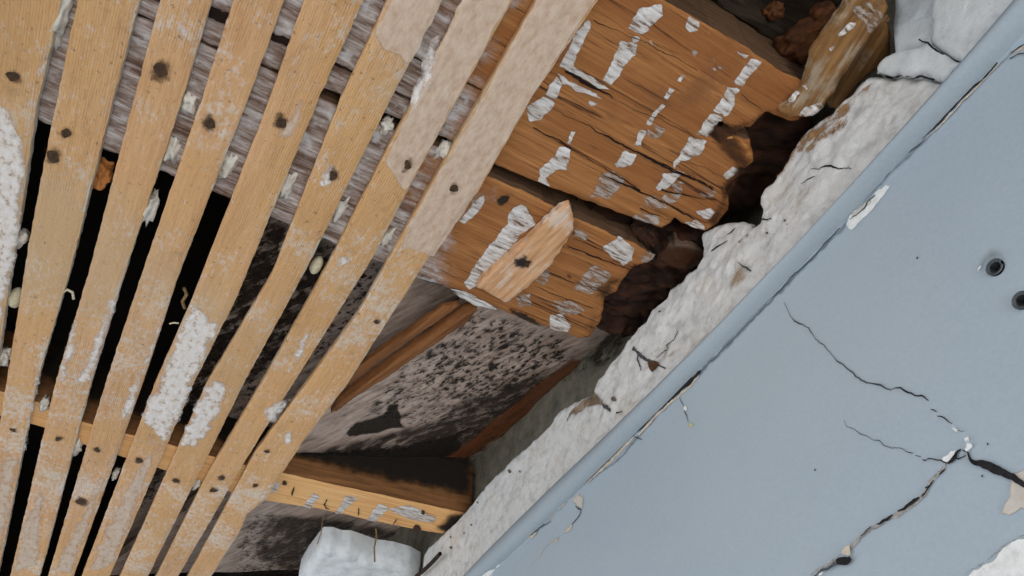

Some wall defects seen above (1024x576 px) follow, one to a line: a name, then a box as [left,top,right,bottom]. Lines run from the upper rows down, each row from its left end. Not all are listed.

damp [42,339,68,384]
damp [89,357,111,402]
damp [133,371,158,415]
damp [295,309,623,494]
crack [586,331,701,484]
spalling [421,77,941,576]
crack [758,228,1024,576]
peeling [1002,470,1024,515]